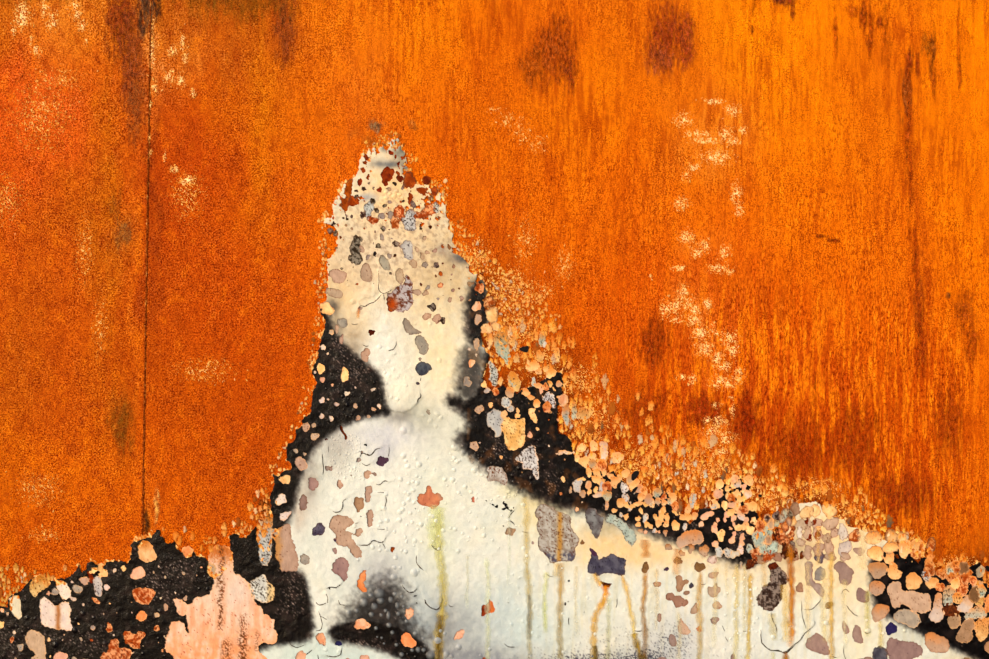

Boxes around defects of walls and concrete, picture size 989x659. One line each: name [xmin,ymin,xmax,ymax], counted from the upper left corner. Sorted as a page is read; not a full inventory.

peeling [1,0,98,169]
peeling [147,18,198,108]
rust [849,1,889,57]
rust [902,35,936,176]
peeling [148,134,209,226]
peeling [671,97,749,219]
peeling [306,130,989,659]
rust [687,391,760,444]
peeling [0,397,347,659]
rust [591,574,608,659]
rust [622,576,647,659]
crack [722,589,868,654]